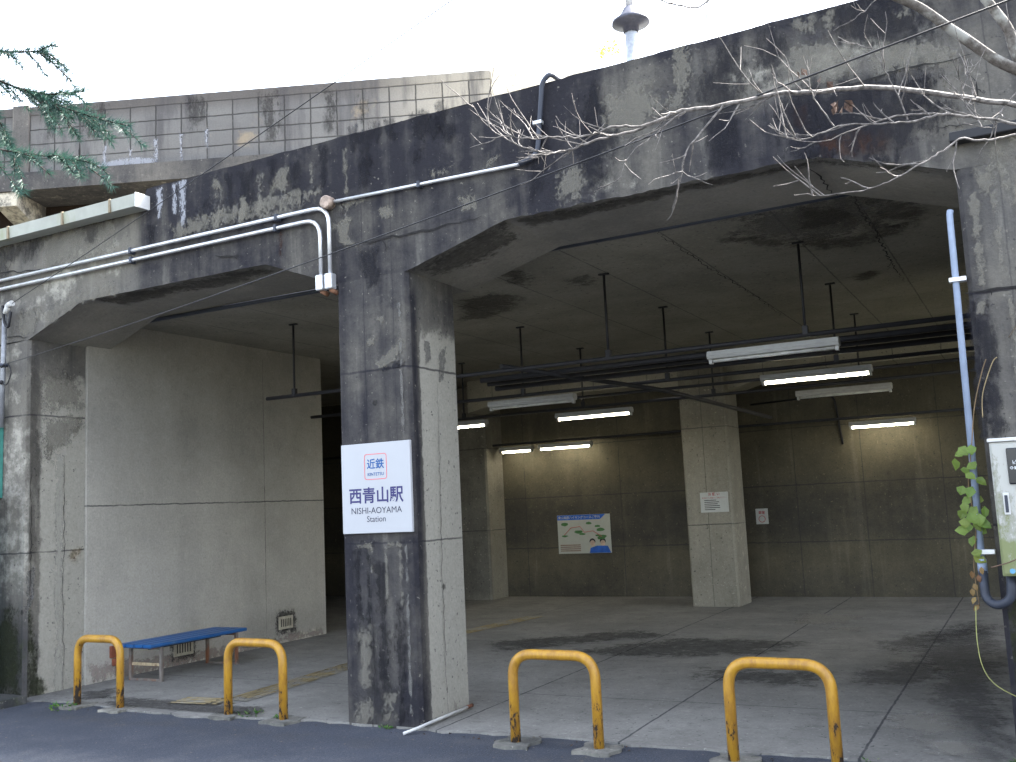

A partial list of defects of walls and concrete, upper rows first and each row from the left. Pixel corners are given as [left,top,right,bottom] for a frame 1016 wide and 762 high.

water stain [757,34,786,88]
water stain [826,0,933,51]
water stain [99,139,158,167]
water stain [148,145,327,245]
water stain [343,107,396,191]
water stain [410,100,455,142]
water stain [528,116,547,198]
water stain [579,88,618,187]
water stain [696,44,746,167]
water stain [684,73,953,191]
water stain [967,300,1006,439]